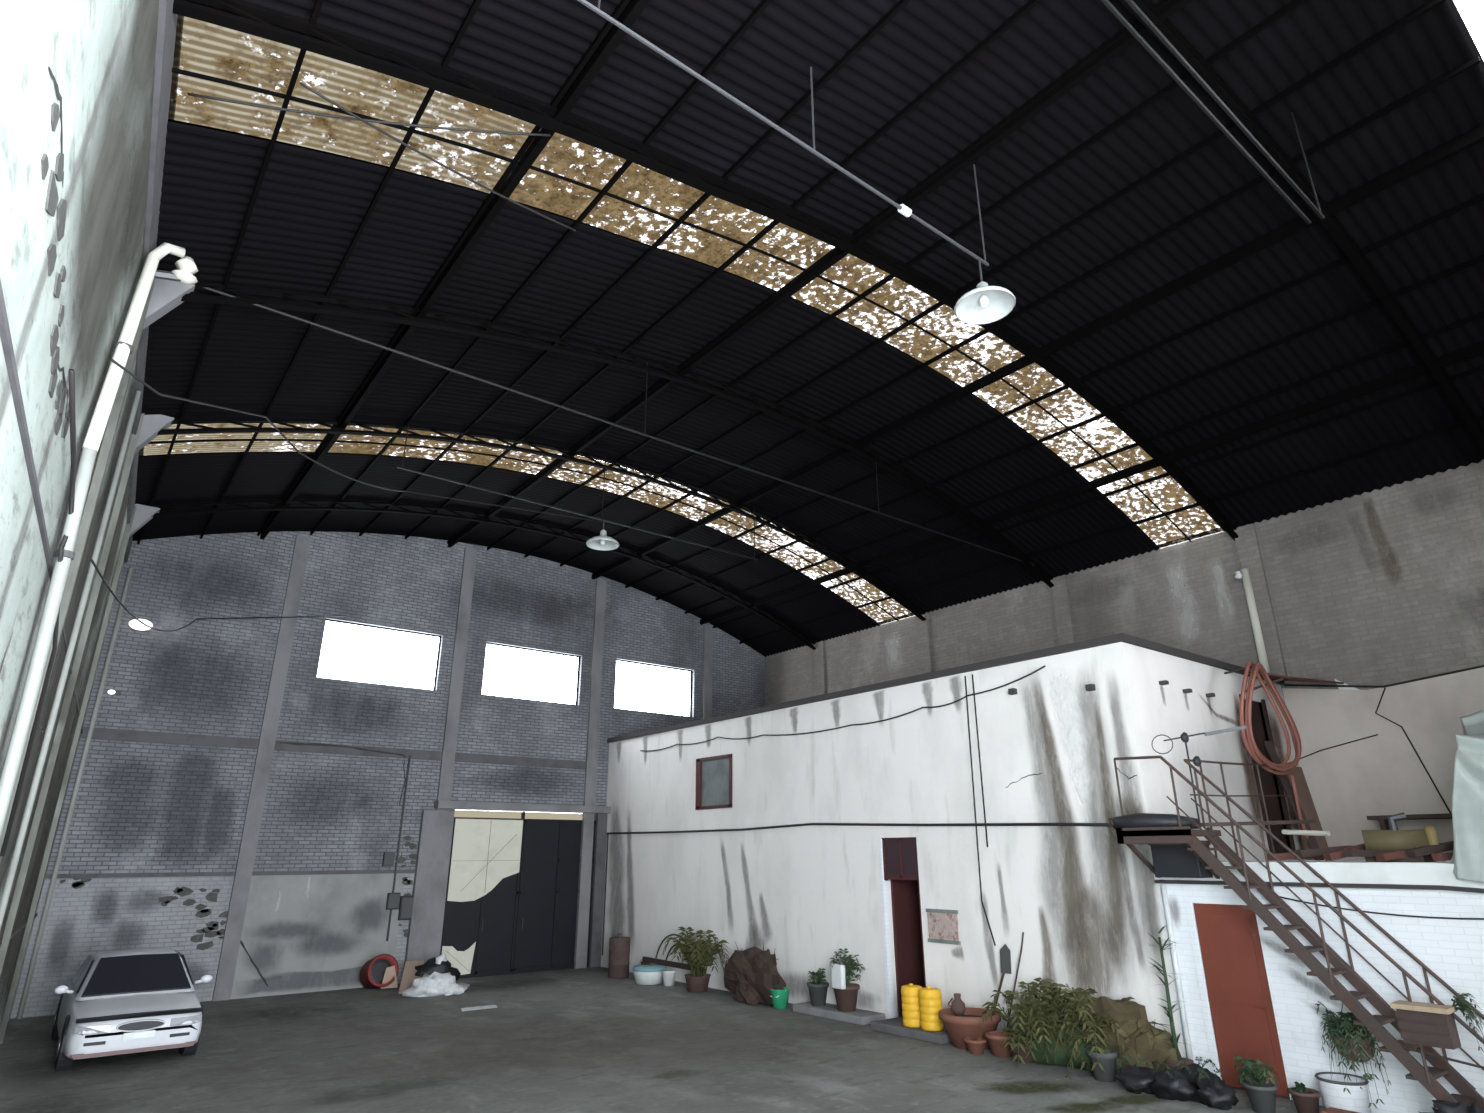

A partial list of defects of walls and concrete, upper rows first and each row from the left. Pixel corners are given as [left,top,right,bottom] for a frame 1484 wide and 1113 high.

leakage [1041,698,1122,994]
spalling [60,878,92,889]
spalling [158,886,228,950]